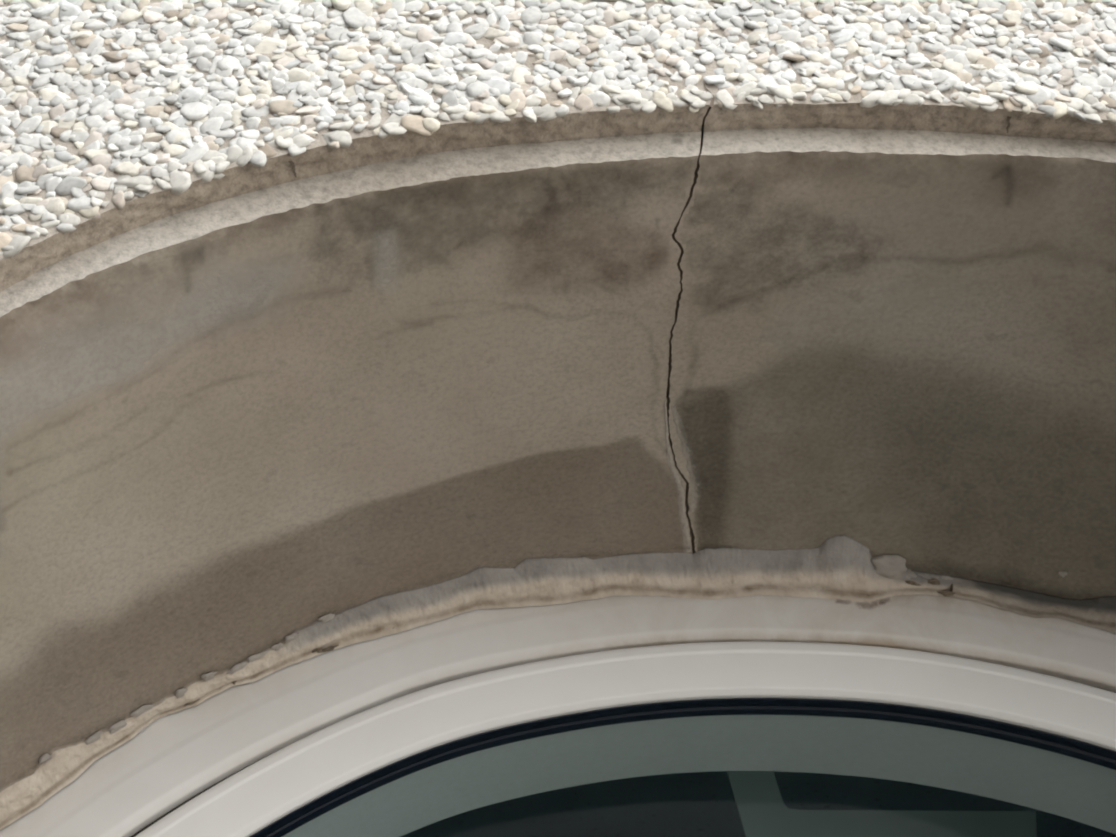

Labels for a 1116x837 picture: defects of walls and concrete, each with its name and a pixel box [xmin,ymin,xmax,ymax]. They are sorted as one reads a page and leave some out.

crack [664,84,715,554]